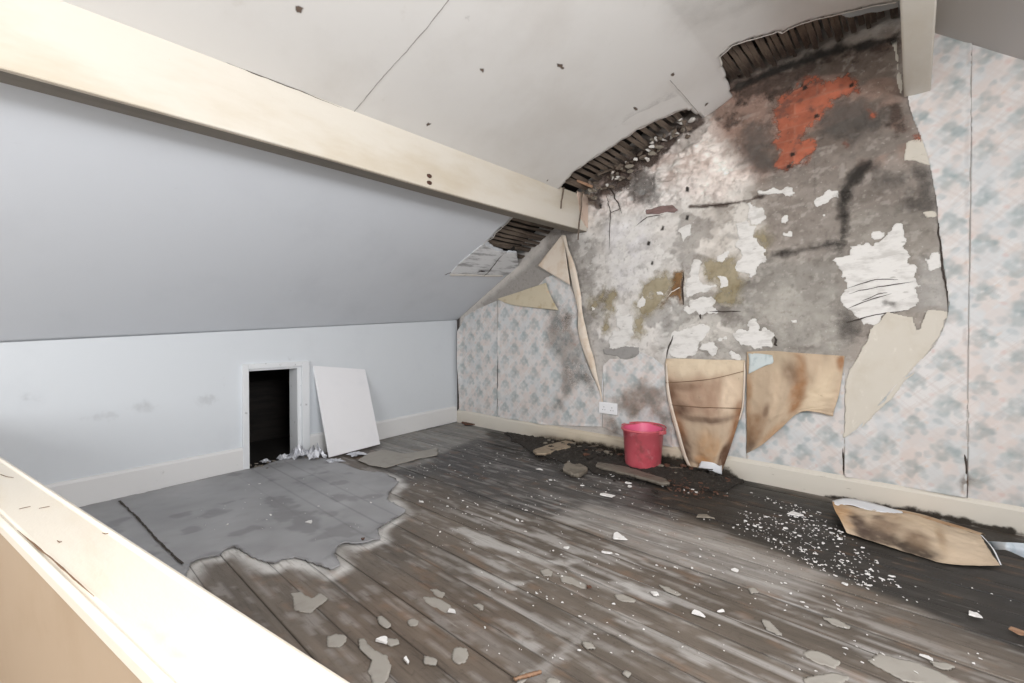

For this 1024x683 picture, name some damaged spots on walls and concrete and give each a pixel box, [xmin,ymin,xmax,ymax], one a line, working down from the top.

peeling [892,41,903,93]
flaking render [772,72,860,171]
peeling [904,135,930,165]
peeling [814,190,839,216]
water stain [813,162,898,248]
peeling [445,244,518,277]
peeling [603,292,663,360]
water stain [634,273,674,334]
water stain [704,258,742,304]
peeling [668,187,795,360]
peeling [833,223,941,325]